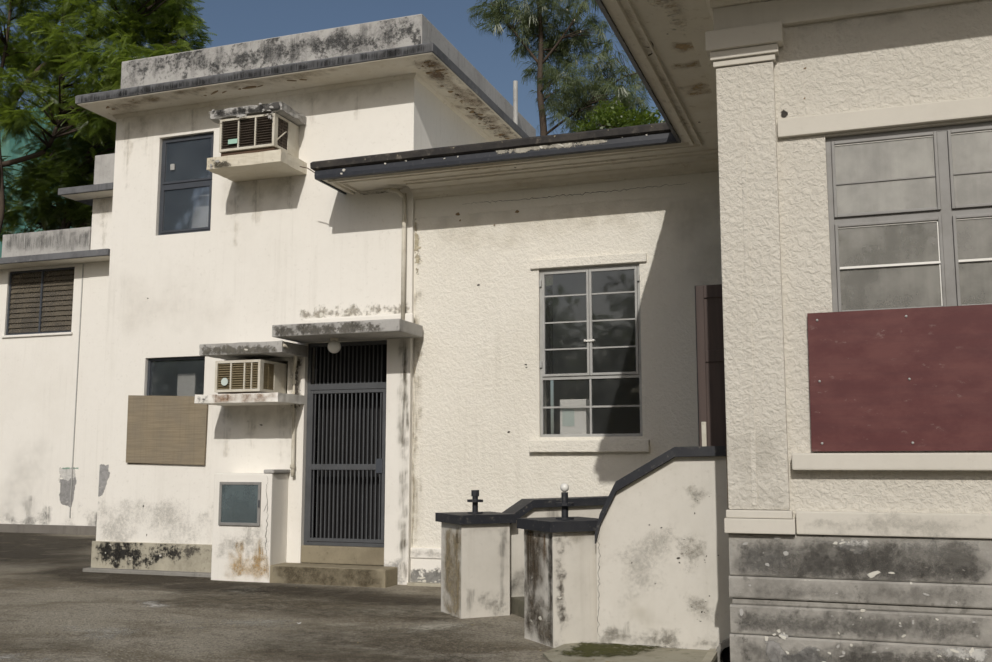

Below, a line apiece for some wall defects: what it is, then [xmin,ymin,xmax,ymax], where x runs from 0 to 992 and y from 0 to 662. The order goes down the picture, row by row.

leakage [81,17,424,102]
leakage [0,530,460,620]
mould [524,530,565,644]